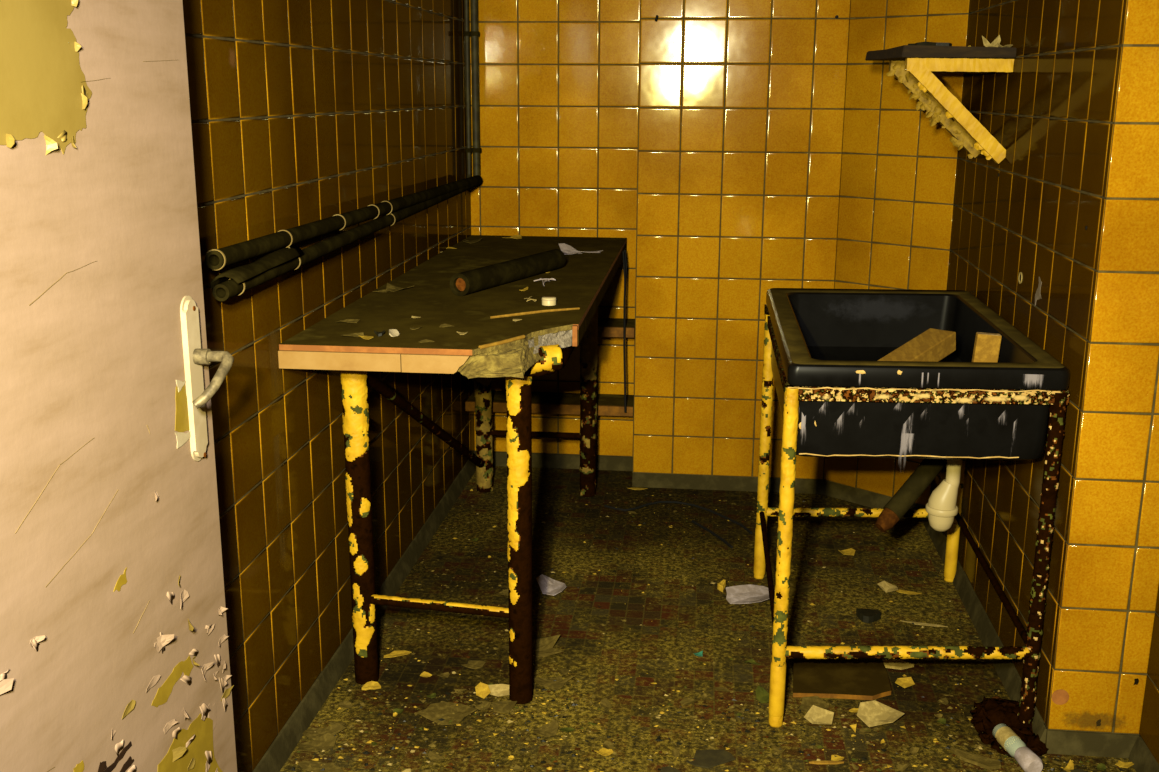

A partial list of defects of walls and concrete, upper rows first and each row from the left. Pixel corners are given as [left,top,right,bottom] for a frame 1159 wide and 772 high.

peeling [0,0,92,156]
peeling [113,567,127,592]
peeling [151,655,194,707]
spalling [98,741,134,772]
peeling [158,713,223,772]